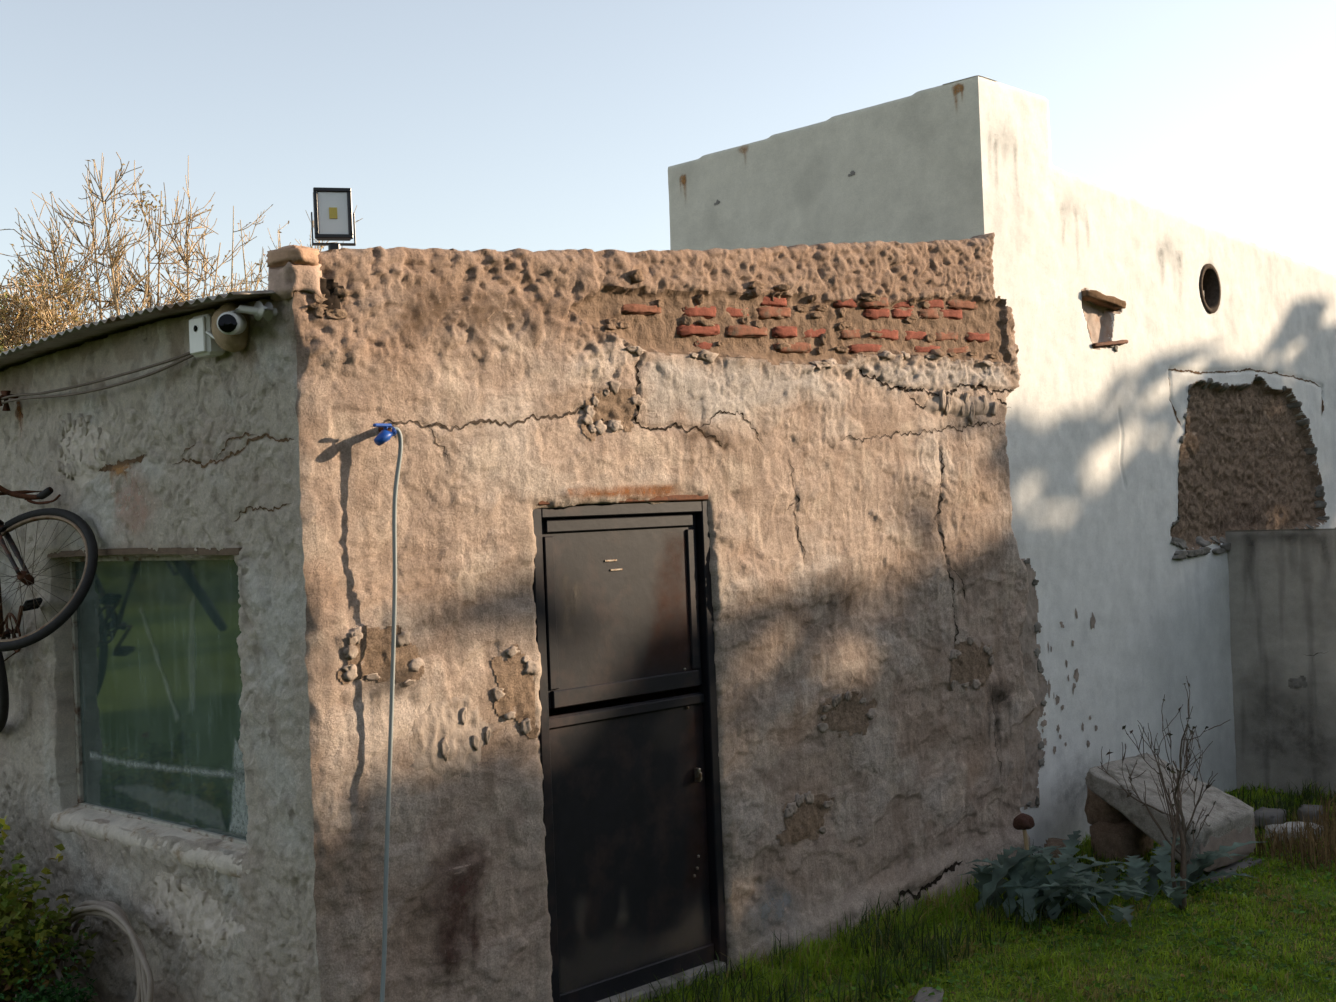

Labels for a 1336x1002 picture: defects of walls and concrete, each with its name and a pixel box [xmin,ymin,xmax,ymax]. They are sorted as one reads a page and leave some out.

flaking render [570,269,1012,371]
crack [98,432,294,473]
crack [371,356,761,459]
crack [787,461,806,560]
crack [840,368,1014,647]
flaking render [1170,374,1330,560]
peeling [1019,558,1096,810]
leakage [437,852,485,963]
crack [892,861,962,912]